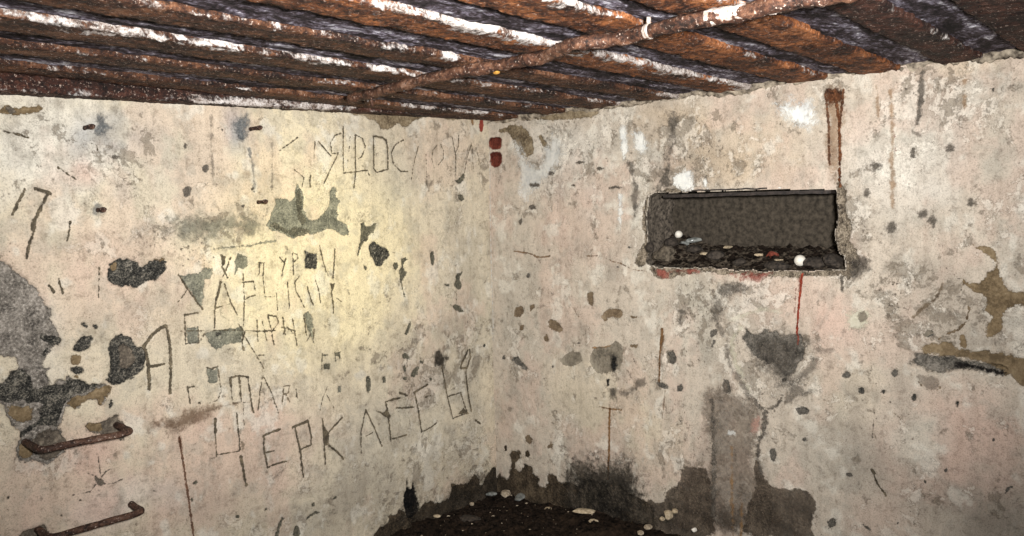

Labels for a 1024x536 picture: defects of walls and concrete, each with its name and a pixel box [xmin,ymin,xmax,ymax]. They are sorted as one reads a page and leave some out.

rust [824,88,845,188]
spalling [107,258,166,288]
peeling [167,184,407,297]
peeling [962,244,1024,337]
spalling [0,261,146,465]
peeling [909,306,1024,386]
leakage [374,385,816,536]